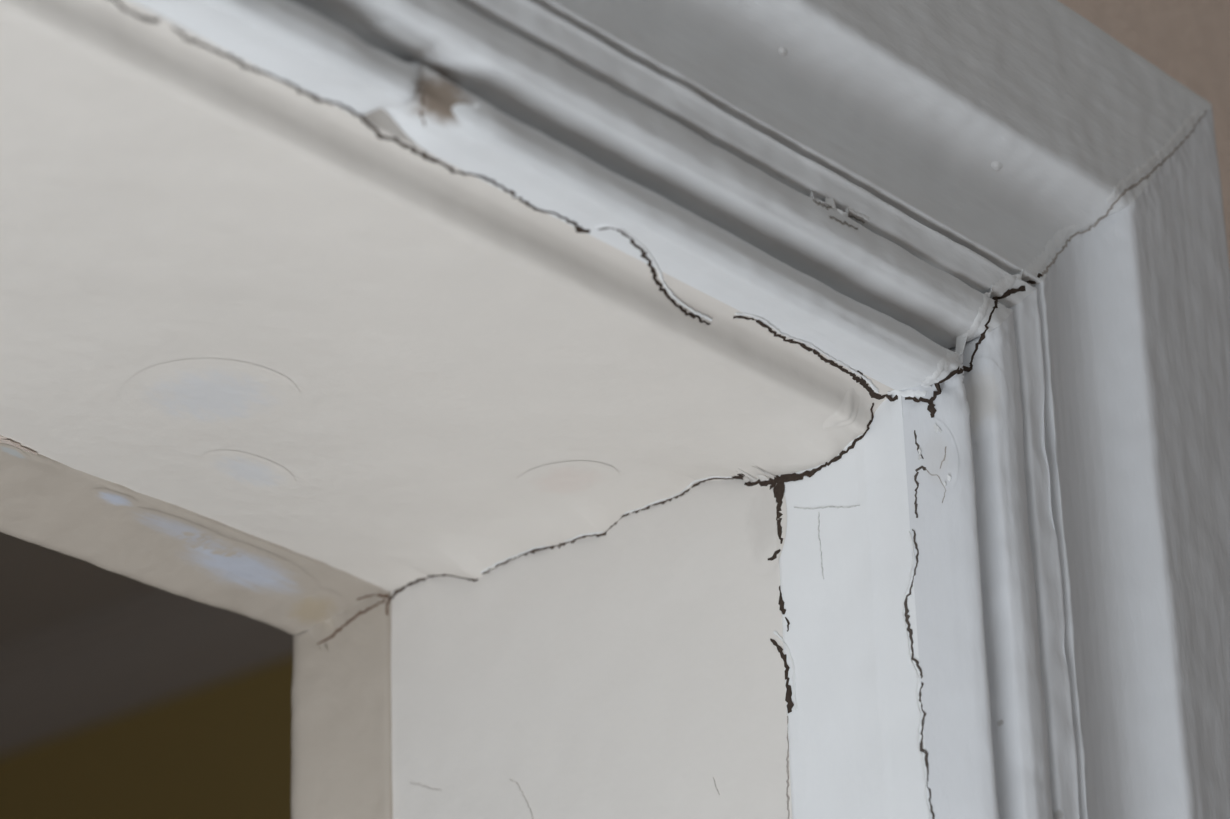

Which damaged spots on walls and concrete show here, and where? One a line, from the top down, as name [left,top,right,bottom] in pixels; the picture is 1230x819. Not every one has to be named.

crack [114,0,712,325]
crack [317,109,1207,819]